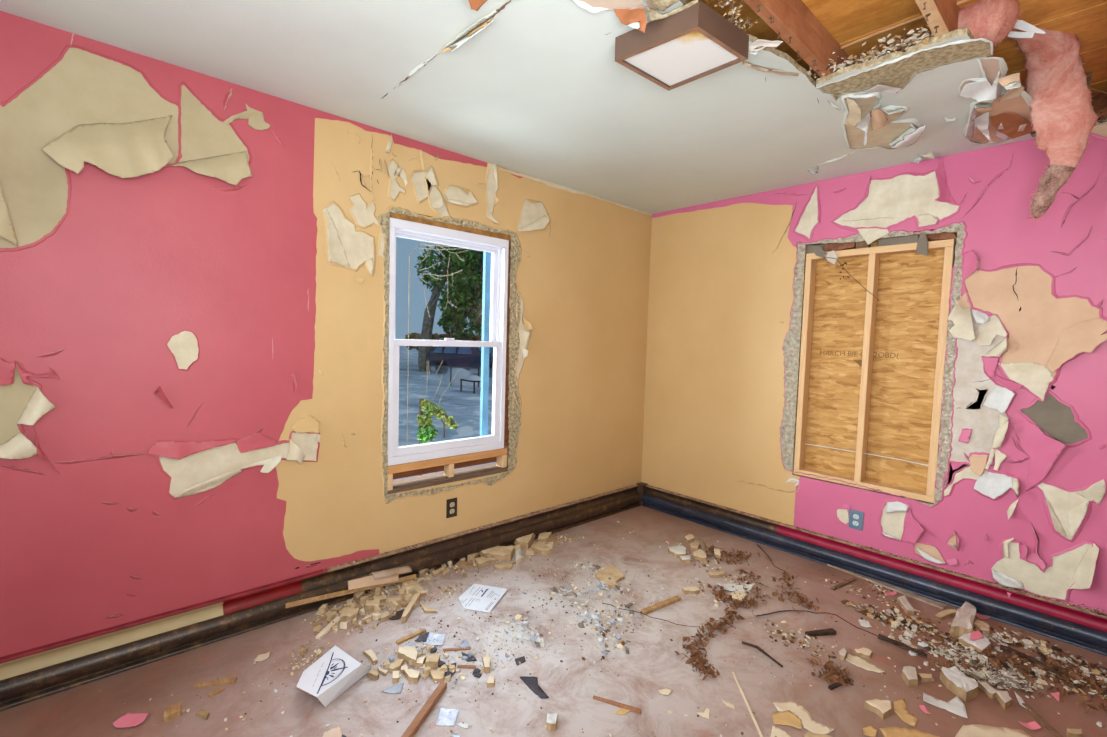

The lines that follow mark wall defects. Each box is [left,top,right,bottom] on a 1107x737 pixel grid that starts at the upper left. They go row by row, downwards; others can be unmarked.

peeling [0,33,285,252]
crack [383,0,511,98]
peeling [468,0,487,11]
peeling [570,0,649,33]
flaking render [749,39,783,55]
peeling [815,38,1034,149]
peeling [1091,124,1107,137]
peeling [0,349,321,500]
peeling [166,330,200,371]
flaking render [321,135,652,504]
peeling [775,156,1107,602]